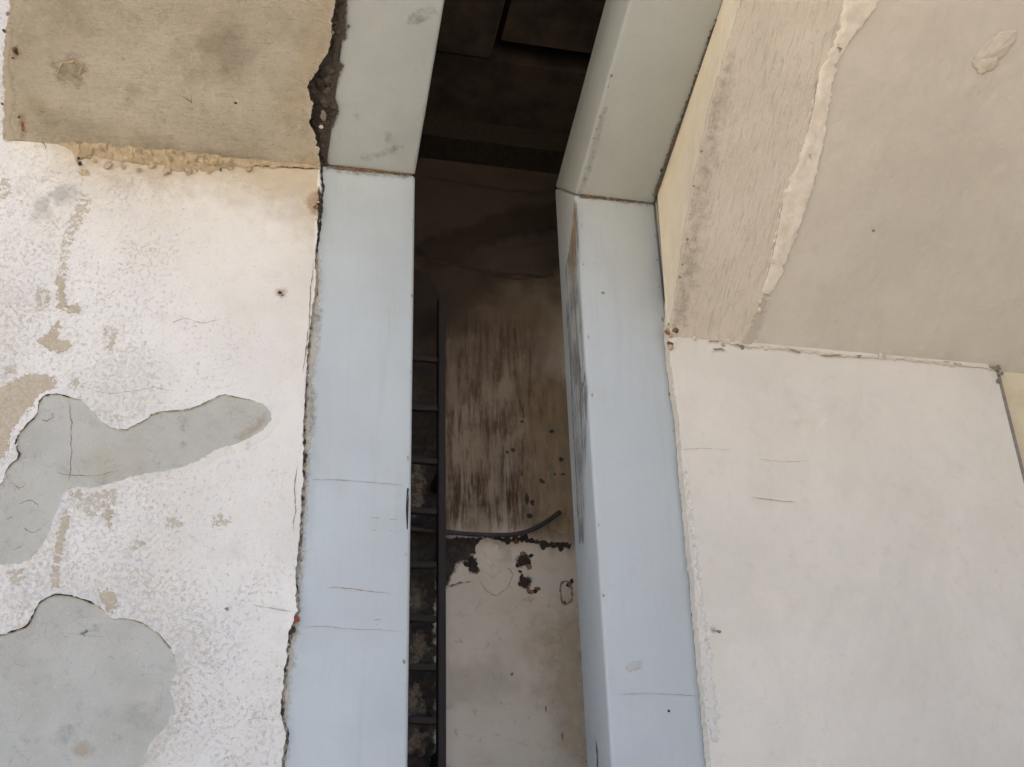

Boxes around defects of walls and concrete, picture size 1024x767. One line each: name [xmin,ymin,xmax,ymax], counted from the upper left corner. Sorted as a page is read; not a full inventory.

spalling [308,0,350,167]
flaking render [0,365,280,767]
crack [255,165,325,767]
flaking render [405,488,572,594]